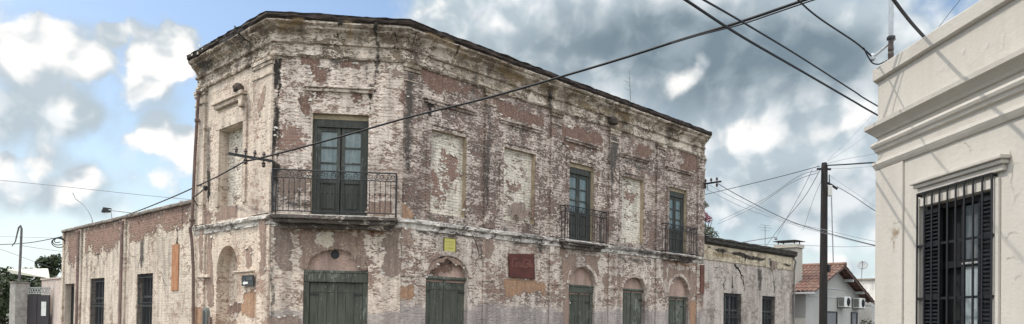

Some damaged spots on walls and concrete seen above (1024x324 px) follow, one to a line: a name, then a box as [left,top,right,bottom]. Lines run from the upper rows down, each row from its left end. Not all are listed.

damp [271,57,309,210]
flaking render [273,57,364,155]
flaking render [420,66,481,96]
flaking render [562,124,604,161]
flaking render [430,148,466,214]
flaking render [506,180,536,222]
flaking render [68,200,238,324]
flaking render [245,219,367,276]
flaking render [365,200,416,302]
flaking render [425,256,468,278]
flaking render [554,246,622,324]
crack [714,264,745,291]